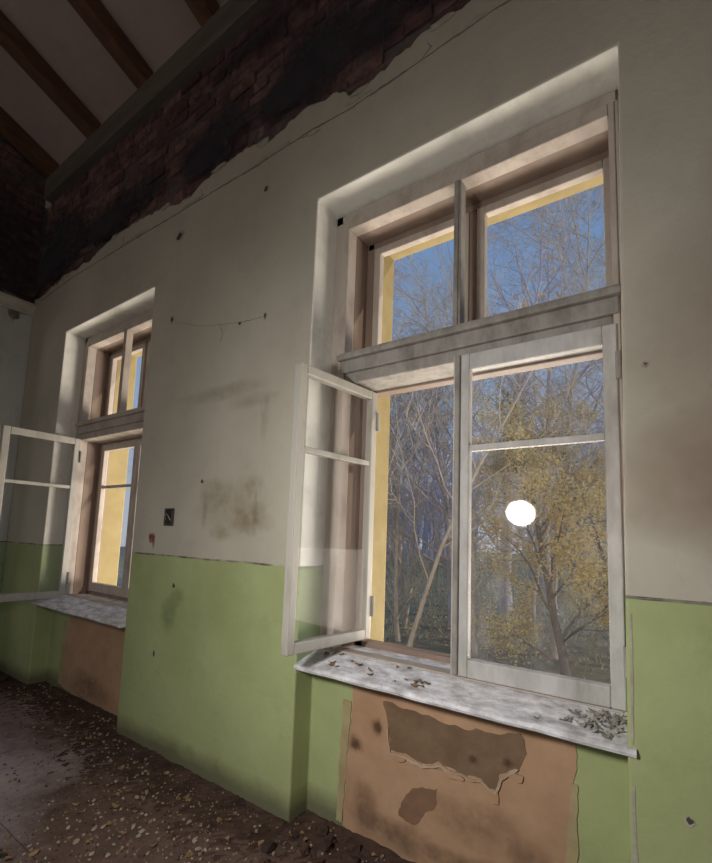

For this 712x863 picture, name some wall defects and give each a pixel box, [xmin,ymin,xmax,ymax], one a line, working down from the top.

flaking render [40,0,471,298]
crack [0,0,511,320]
peeling [58,615,125,721]
peeling [336,685,579,863]